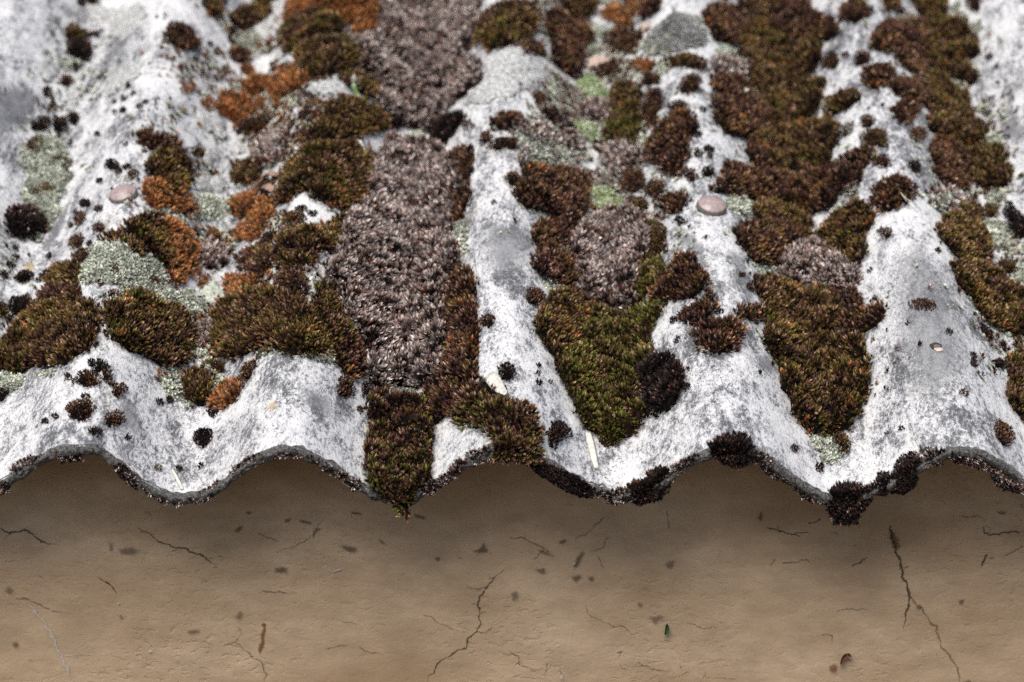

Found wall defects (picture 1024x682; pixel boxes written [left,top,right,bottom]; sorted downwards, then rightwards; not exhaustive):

crack [0,528,58,545]
crack [139,528,211,563]
crack [889,526,911,623]
crack [427,568,505,681]